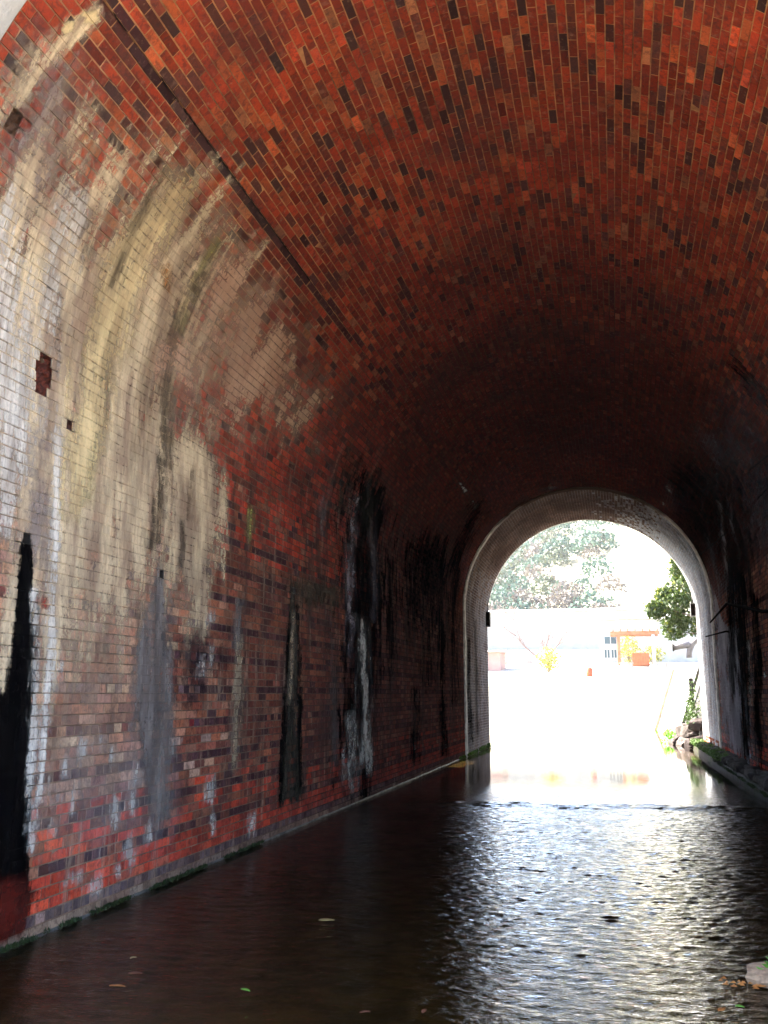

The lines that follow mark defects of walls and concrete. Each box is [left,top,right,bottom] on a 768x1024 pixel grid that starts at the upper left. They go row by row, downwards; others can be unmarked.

spalling [0,99,31,142]
spalling [34,351,59,397]
water stain [0,53,334,944]
water stain [278,449,484,807]
water stain [664,450,766,769]